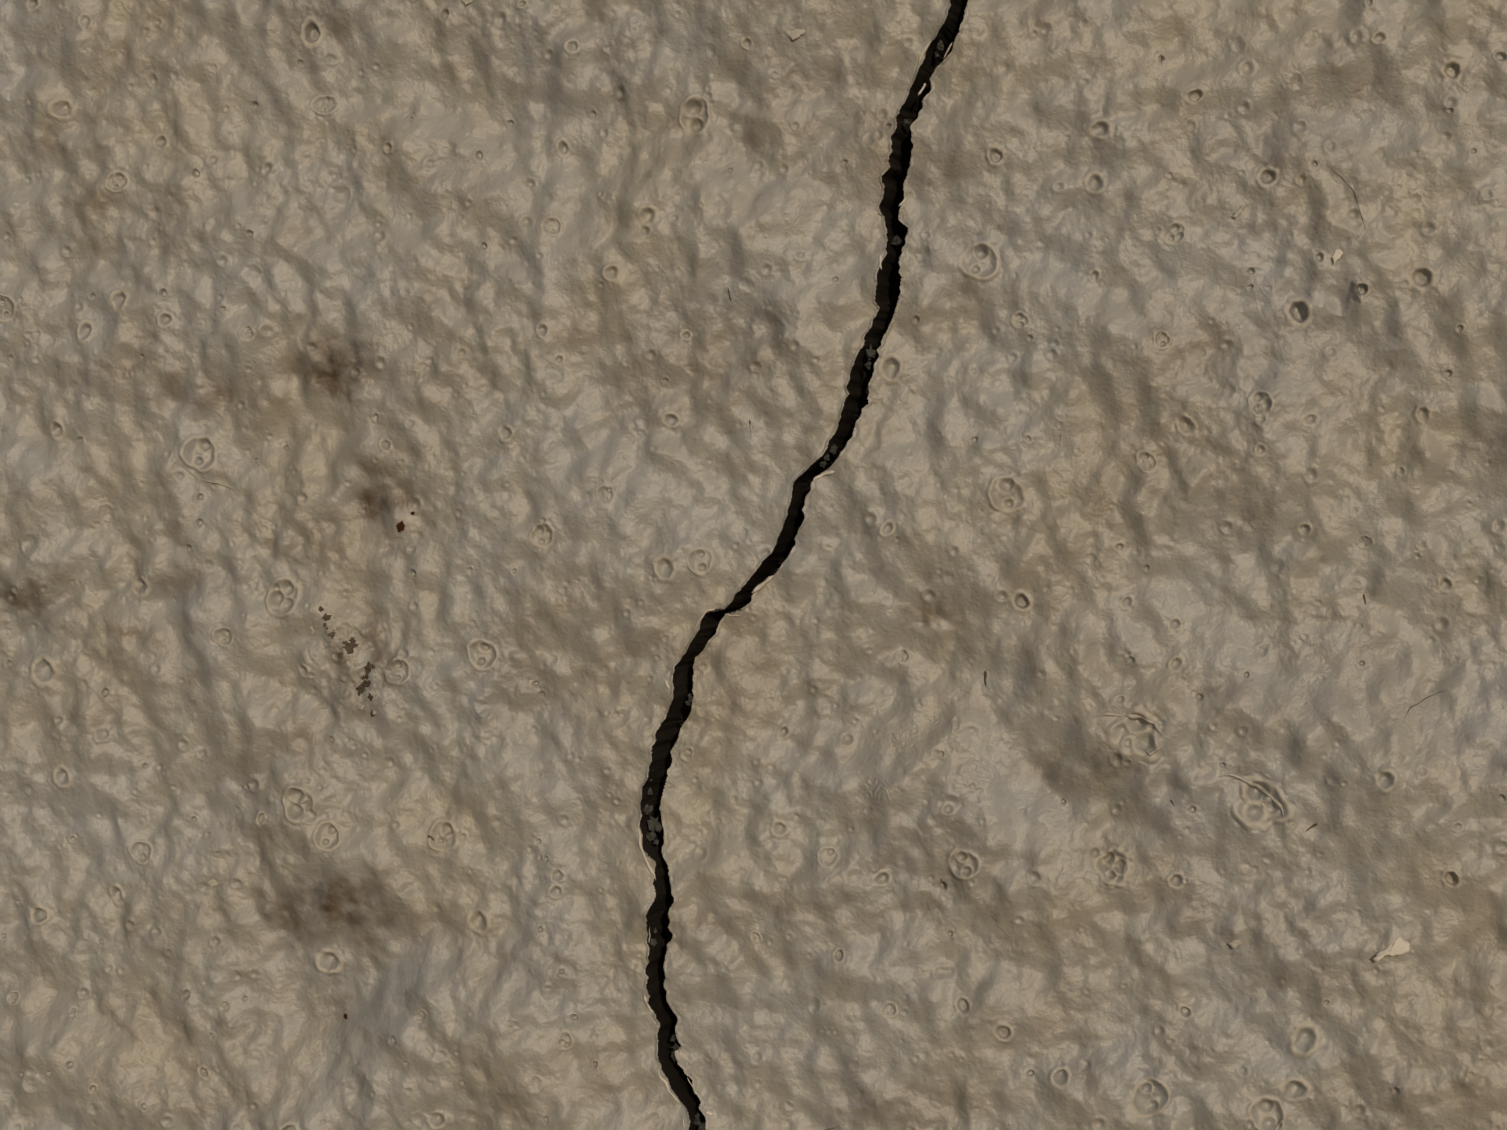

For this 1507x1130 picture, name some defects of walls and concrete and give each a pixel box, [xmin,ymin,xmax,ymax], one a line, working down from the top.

crack [636,0,972,1130]